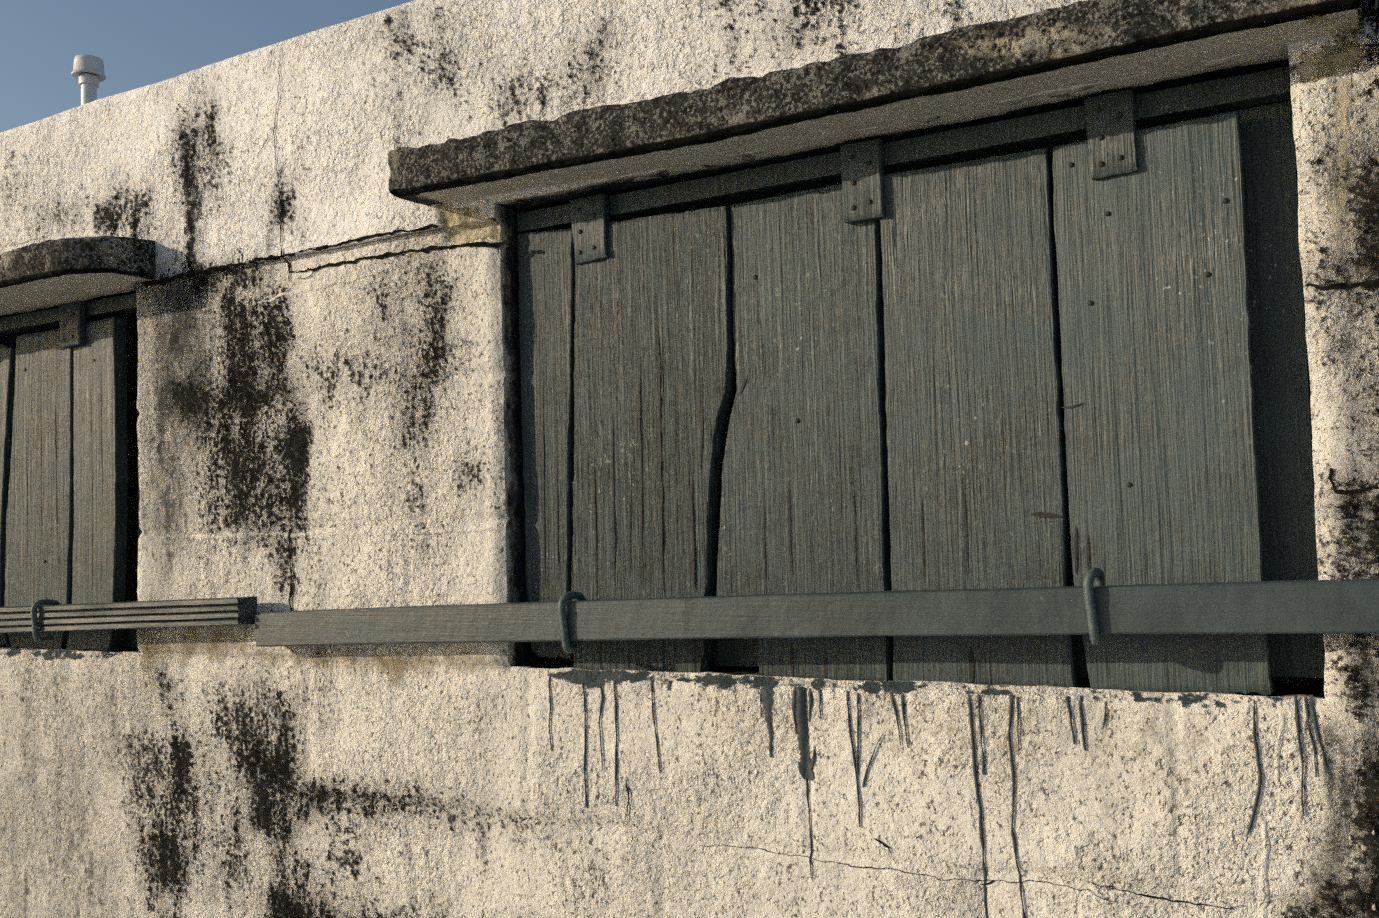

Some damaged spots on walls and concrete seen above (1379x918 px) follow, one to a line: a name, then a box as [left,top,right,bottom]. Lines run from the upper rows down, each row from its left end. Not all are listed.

leakage [0,74,497,601]
crack [142,40,510,288]
leakage [348,0,633,149]
leakage [679,0,861,81]
leakage [879,0,1002,40]
leakage [1296,0,1379,580]
crack [1303,280,1379,290]
crack [1328,468,1379,494]
leakage [11,644,579,918]
leakage [1276,633,1379,918]